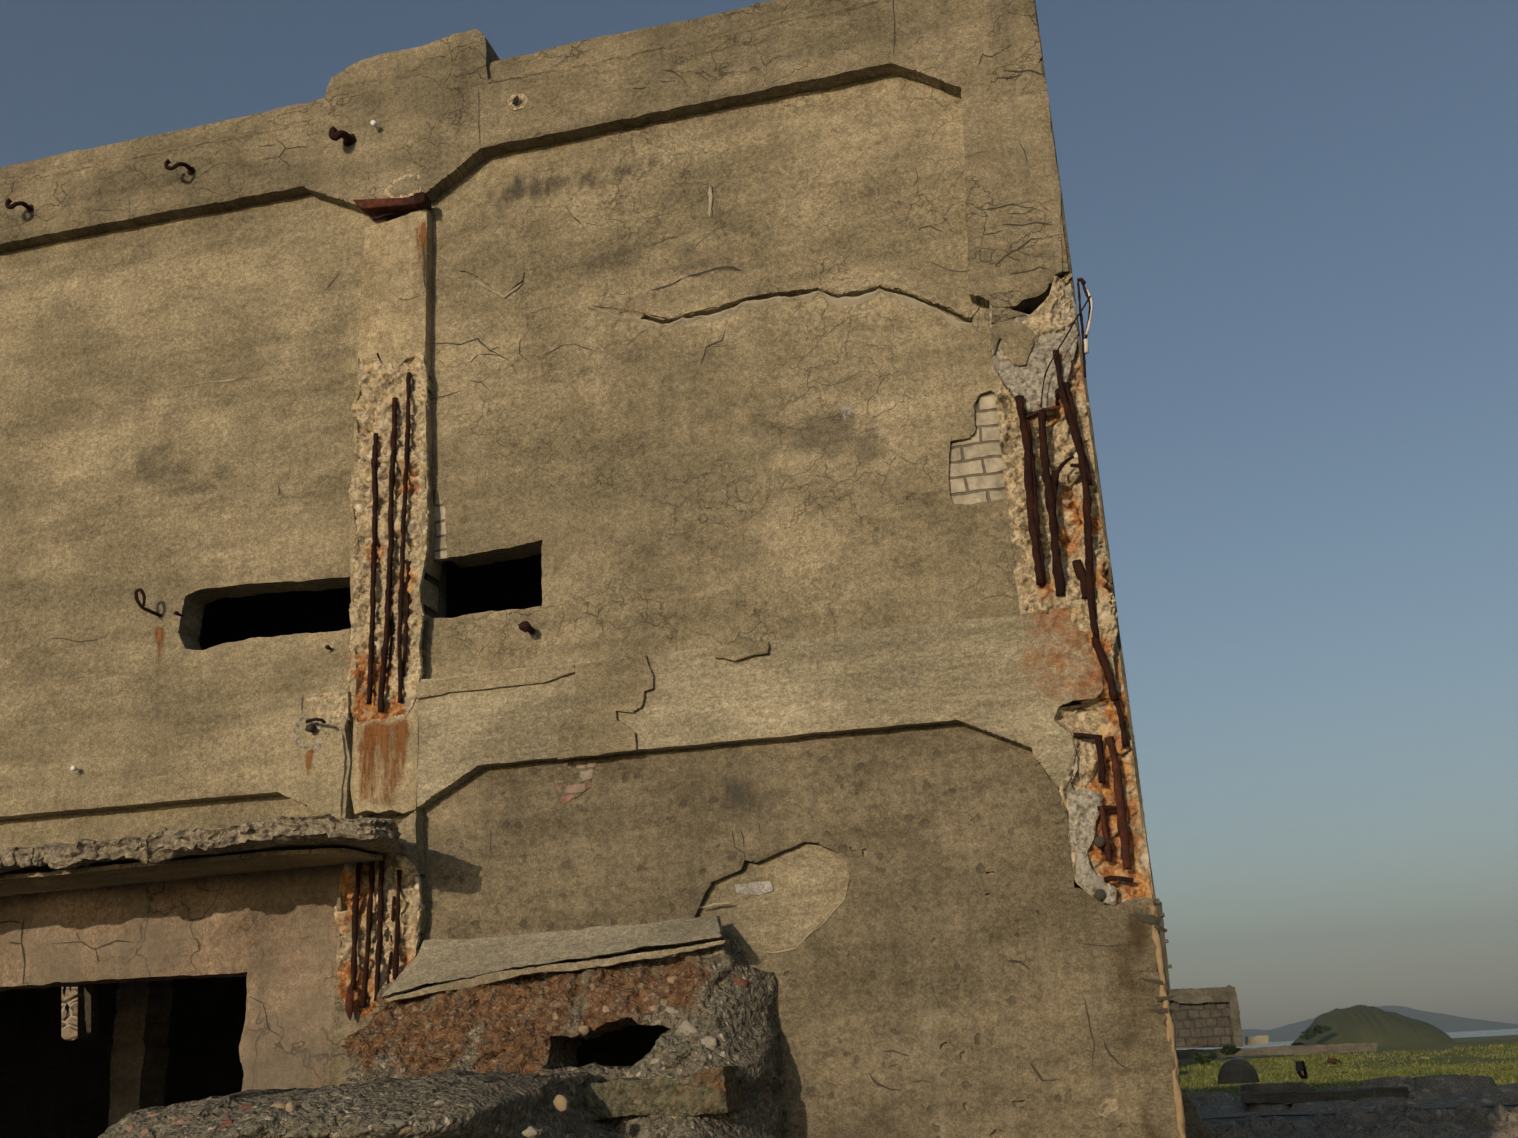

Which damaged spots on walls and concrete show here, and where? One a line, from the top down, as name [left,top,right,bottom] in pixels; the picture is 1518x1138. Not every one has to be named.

crack [430,204,1053,400]
rust [359,720,408,801]
peeling [293,273,1186,1138]